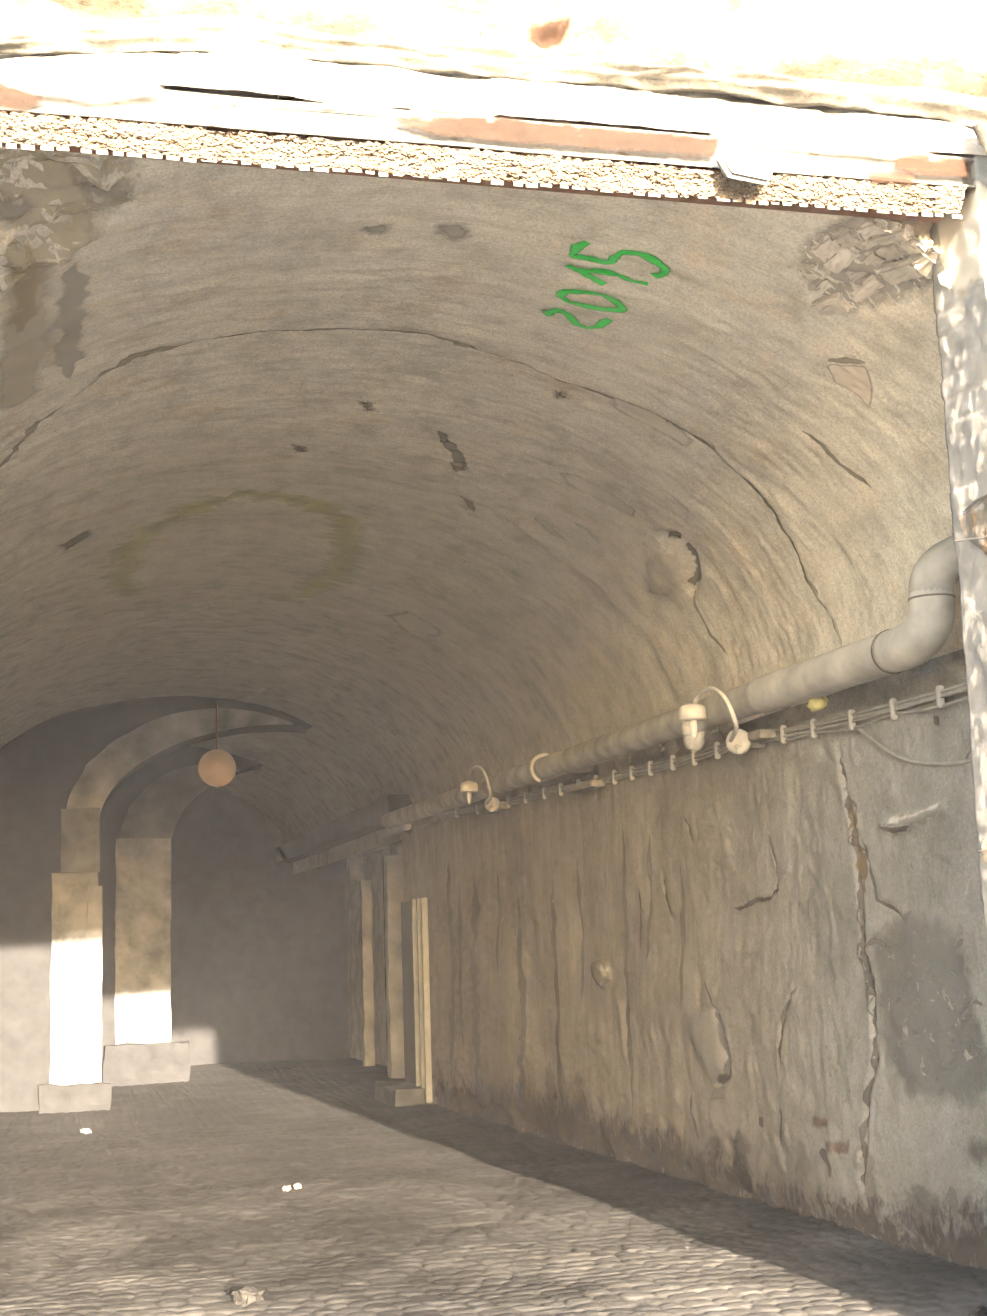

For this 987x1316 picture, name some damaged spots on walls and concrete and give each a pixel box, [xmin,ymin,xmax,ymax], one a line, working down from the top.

corrosion [396,117,718,157]
corrosion [866,154,969,184]
flaking render [800,217,952,317]
water stain [0,249,87,407]
spalling [828,357,872,406]
crack [0,328,836,631]
crack [802,431,870,486]
crack [693,591,727,654]
crack [840,755,904,1197]